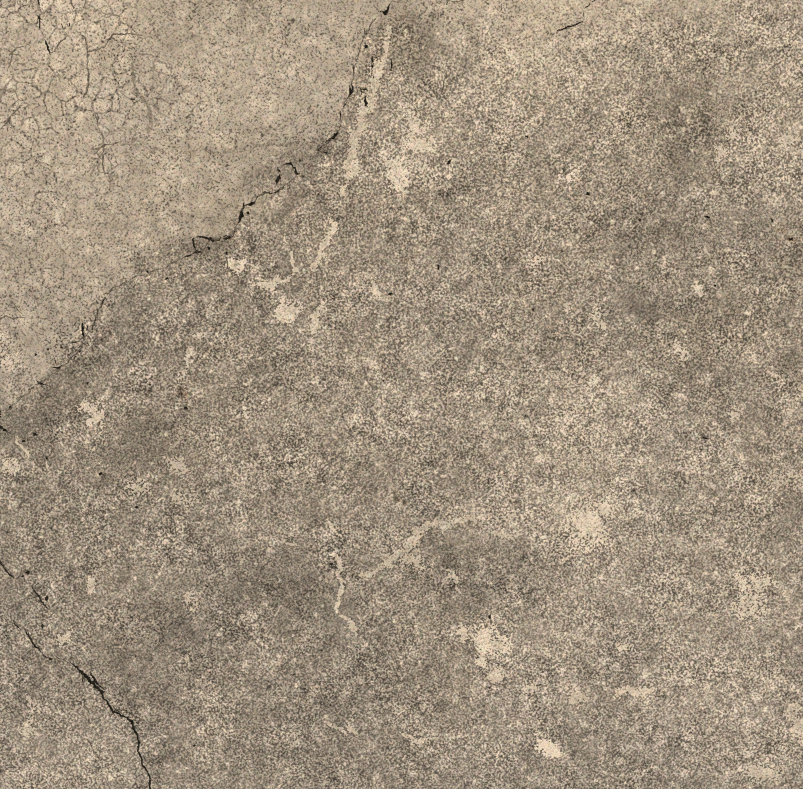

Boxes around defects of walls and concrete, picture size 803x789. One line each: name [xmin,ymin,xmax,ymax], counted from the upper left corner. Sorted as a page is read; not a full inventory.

crack [0,0,400,470]
crack [0,561,151,789]